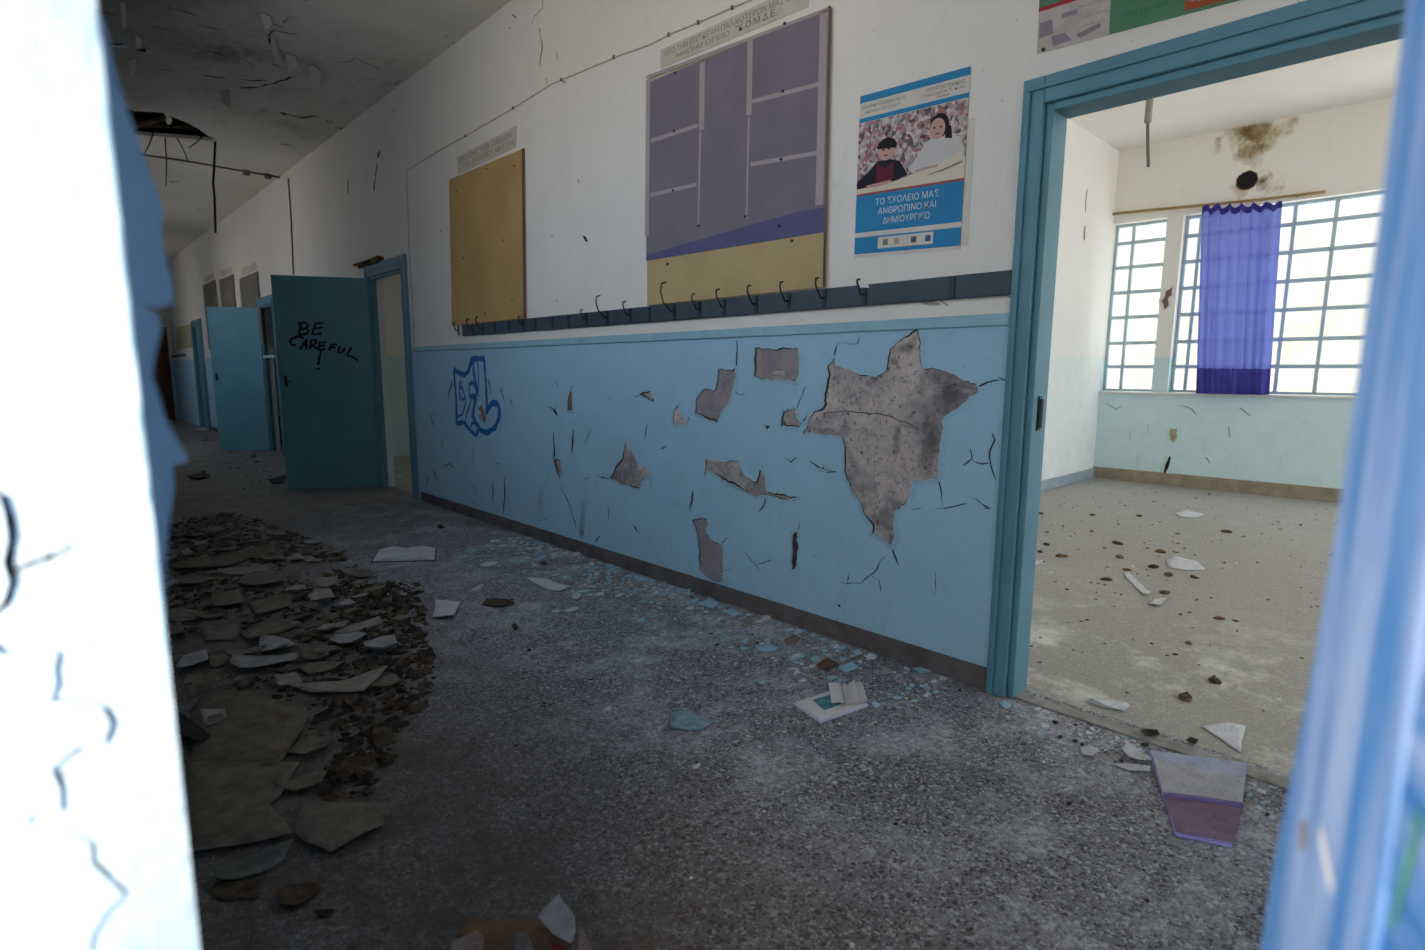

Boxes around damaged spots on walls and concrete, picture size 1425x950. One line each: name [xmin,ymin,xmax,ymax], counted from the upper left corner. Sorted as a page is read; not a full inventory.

peeling [92,2,188,654]
peeling [597,440,652,491]
peeling [634,388,657,405]
peeling [671,329,1005,564]
crack [823,411,923,432]
crack [933,433,996,509]
peeling [0,505,8,603]
peeling [691,515,735,584]
crack [812,554,886,590]
peeling [0,650,124,950]